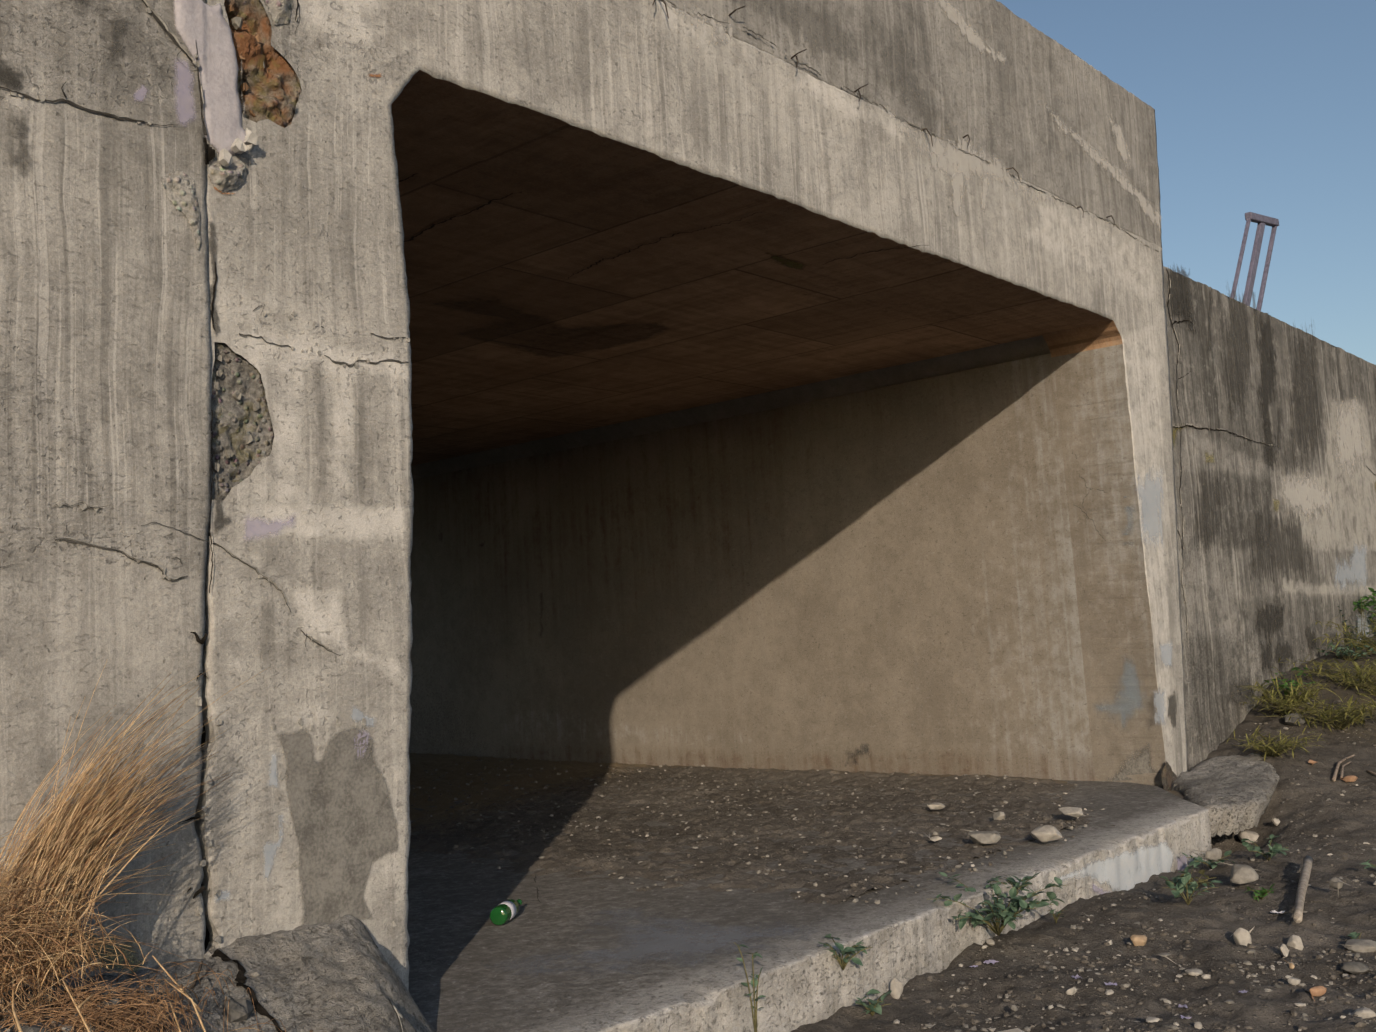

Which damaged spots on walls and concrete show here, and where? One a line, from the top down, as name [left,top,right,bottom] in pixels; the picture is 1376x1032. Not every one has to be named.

crack [0,0,208,136]
crack [55,410,343,655]
spalling [210,342,274,500]
crack [661,0,1275,661]
crack [178,632,285,1032]